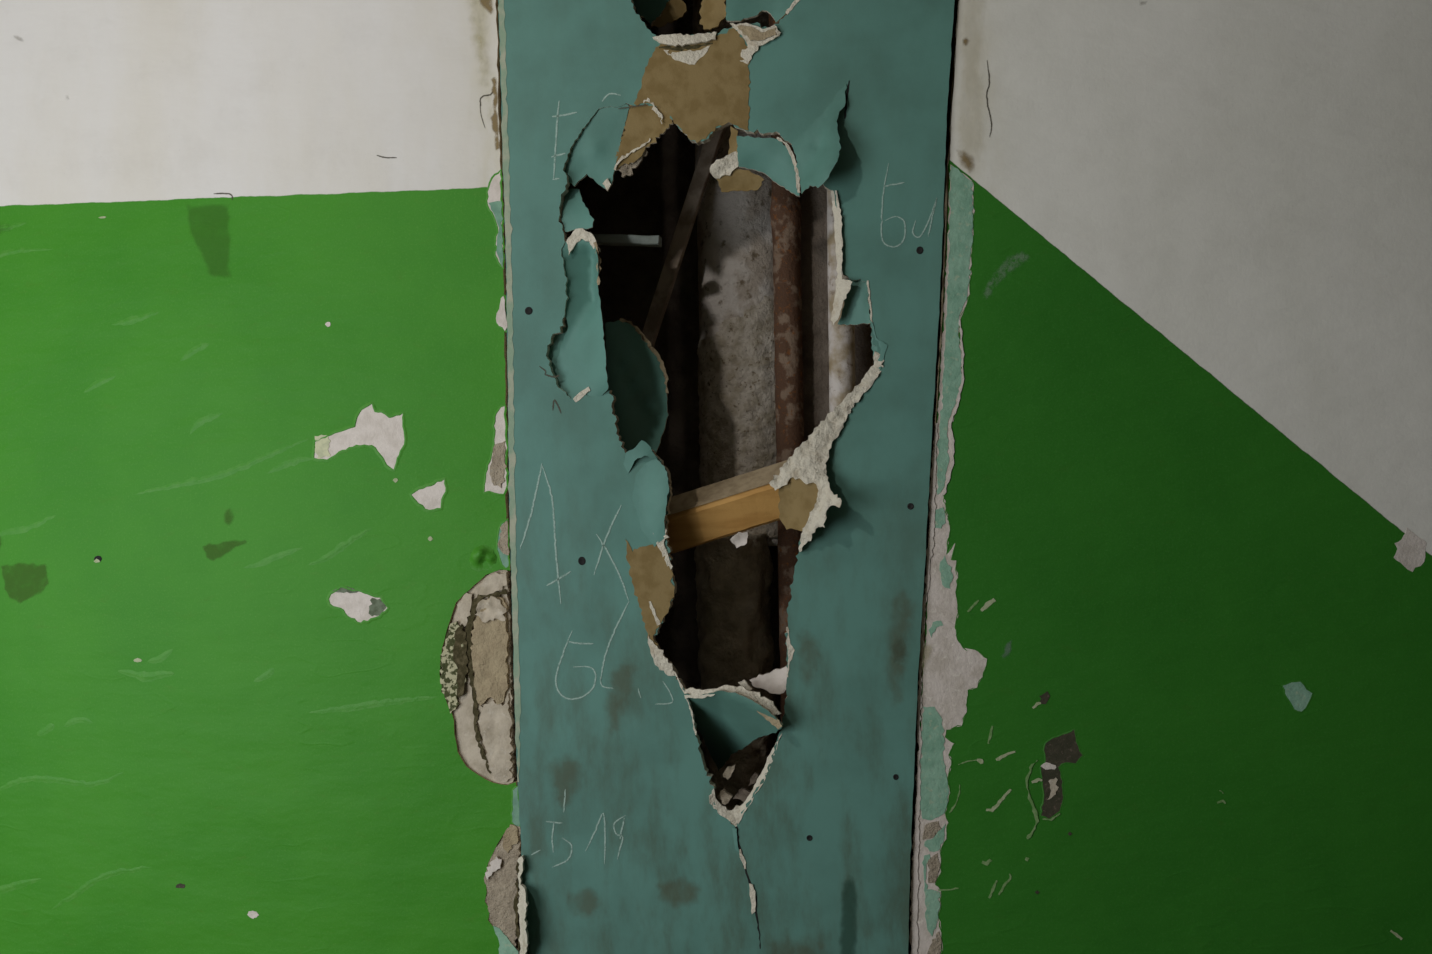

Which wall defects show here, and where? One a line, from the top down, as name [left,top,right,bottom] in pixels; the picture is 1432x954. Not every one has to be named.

spalling [697,85,888,552]
peeling [326,584,390,626]
peeling [312,401,408,483]
peeling [409,477,449,513]
spalling [548,98,795,827]
peeling [909,165,988,954]
peeling [1394,528,1427,572]
spalling [440,518,529,954]
peeling [1026,728,1084,839]